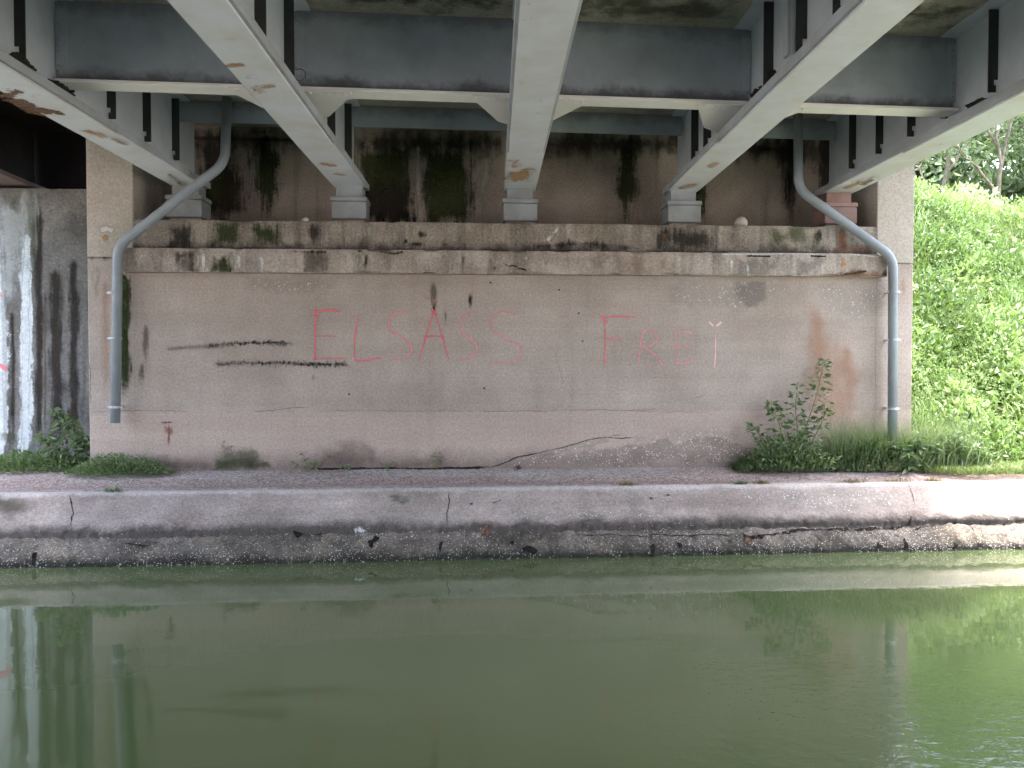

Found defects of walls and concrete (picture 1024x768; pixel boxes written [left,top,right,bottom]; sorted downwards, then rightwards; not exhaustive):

rust [0,89,64,116]
water stain [351,130,501,268]
rust [505,162,535,182]
water stain [544,133,678,217]
water stain [657,227,717,252]
water stain [10,200,80,437]
crack [309,396,700,533]